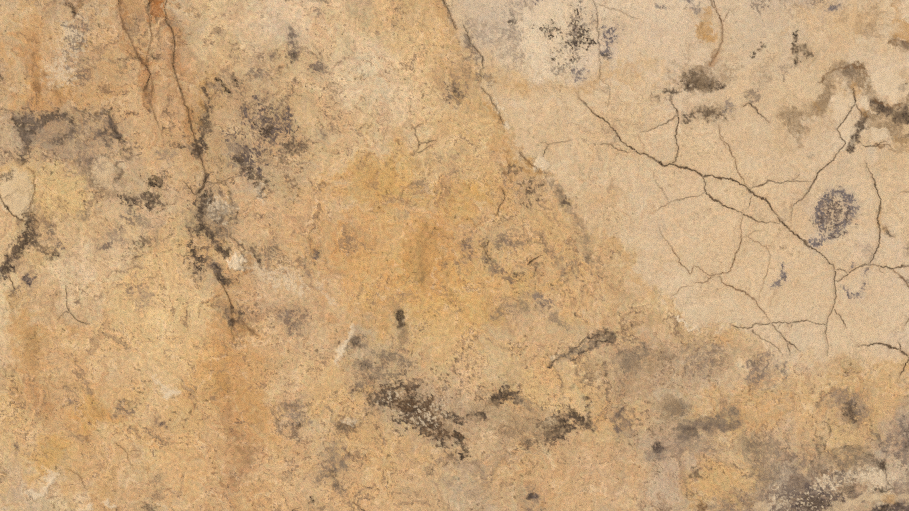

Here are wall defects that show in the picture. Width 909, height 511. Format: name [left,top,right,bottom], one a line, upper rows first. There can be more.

crack [117,0,241,196]
crack [410,123,437,156]
crack [442,0,505,133]
leakage [439,0,643,122]
crack [518,139,573,174]
leakage [650,0,769,130]
crack [578,0,909,376]
leakage [745,0,909,159]
leakage [804,185,862,250]
crack [215,275,260,342]
leakage [274,305,909,511]